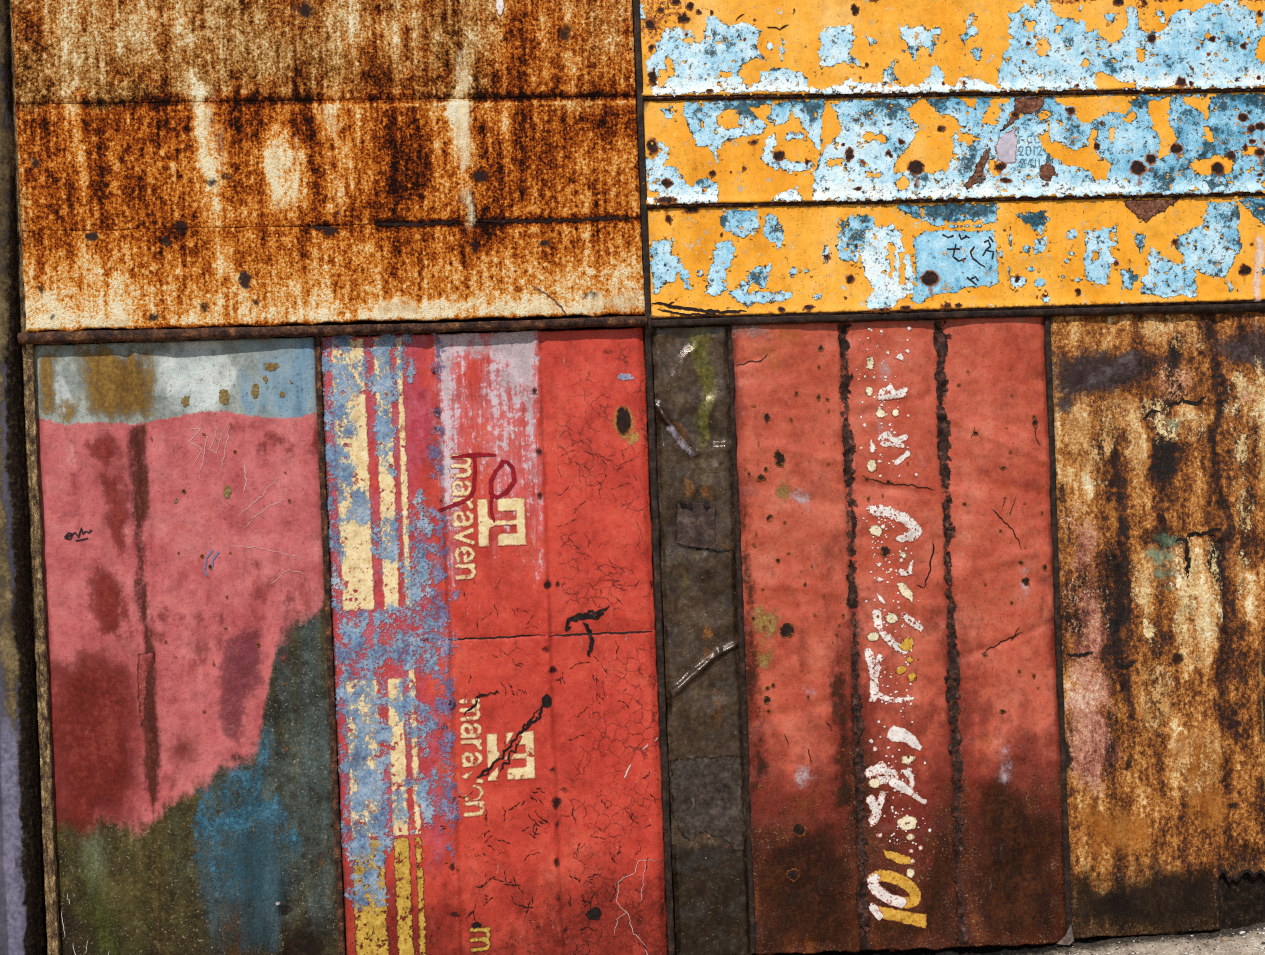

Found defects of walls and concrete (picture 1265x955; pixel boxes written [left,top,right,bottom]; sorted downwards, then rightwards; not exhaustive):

corrosion [480,216,636,224]
peeling [640,0,1265,312]
corrosion [39,345,155,421]
peeling [321,333,499,915]
crack [421,438,653,740]
corrosion [1052,314,1265,851]
crack [1174,528,1221,579]
spalling [477,706,543,779]
damp [830,672,852,805]
damp [760,819,857,944]
damp [881,859,950,943]
damp [972,777,1216,936]